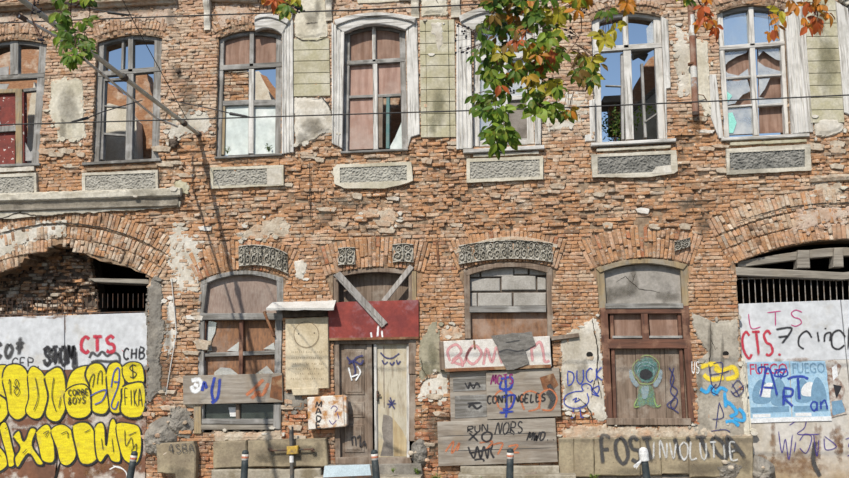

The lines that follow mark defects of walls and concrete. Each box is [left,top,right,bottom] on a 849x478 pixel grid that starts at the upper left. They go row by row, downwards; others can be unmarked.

peeling [0,5,179,31]
peeling [38,76,94,171]
spalling [140,23,758,441]
spalling [790,115,849,236]
spalling [393,321,466,467]